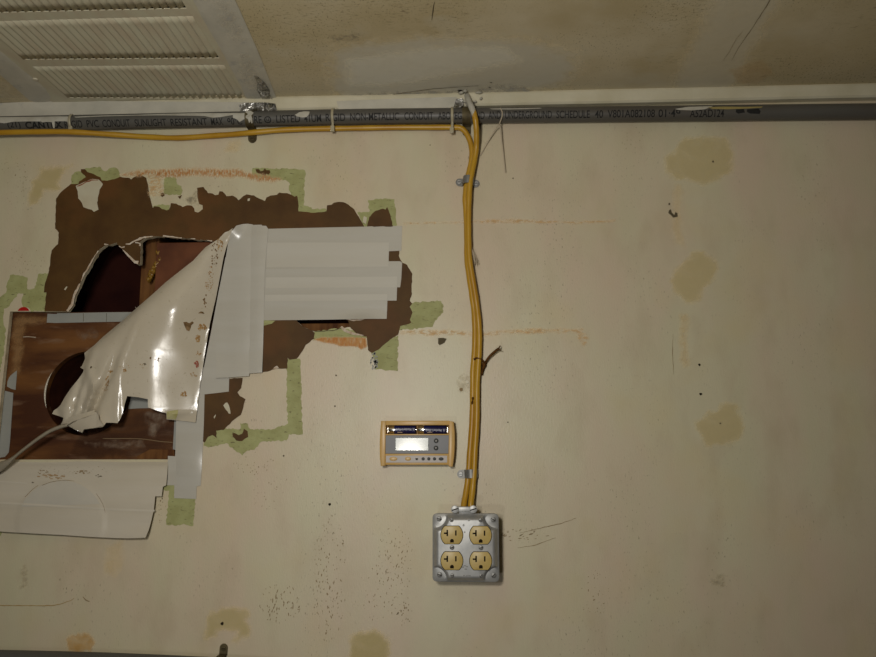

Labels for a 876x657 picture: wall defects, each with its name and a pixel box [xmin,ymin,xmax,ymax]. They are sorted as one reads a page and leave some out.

damp [668,139,732,183]
peeling [0,167,397,371]
peeling [203,251,444,455]
damp [698,406,741,444]
peeling [163,485,195,526]
damp [207,609,249,636]
damp [351,631,389,657]